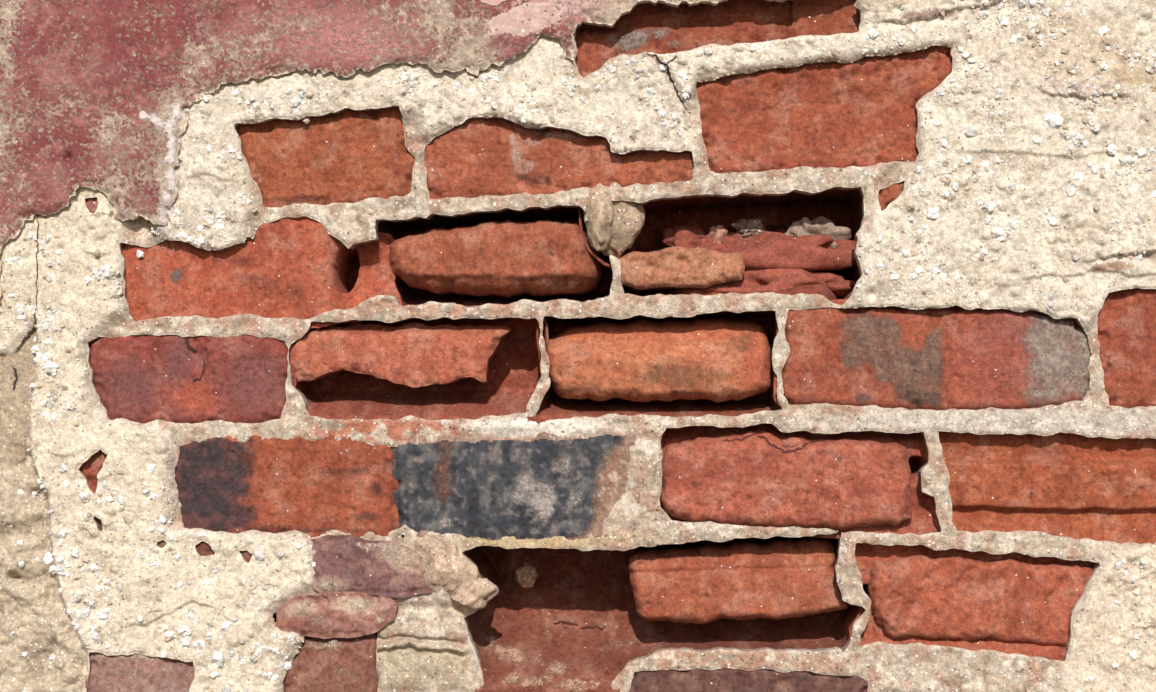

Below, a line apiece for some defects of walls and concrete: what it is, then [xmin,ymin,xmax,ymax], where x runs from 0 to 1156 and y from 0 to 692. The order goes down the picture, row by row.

spalling [0,0,1156,334]
spalling [0,187,316,692]
spalling [302,311,1156,692]